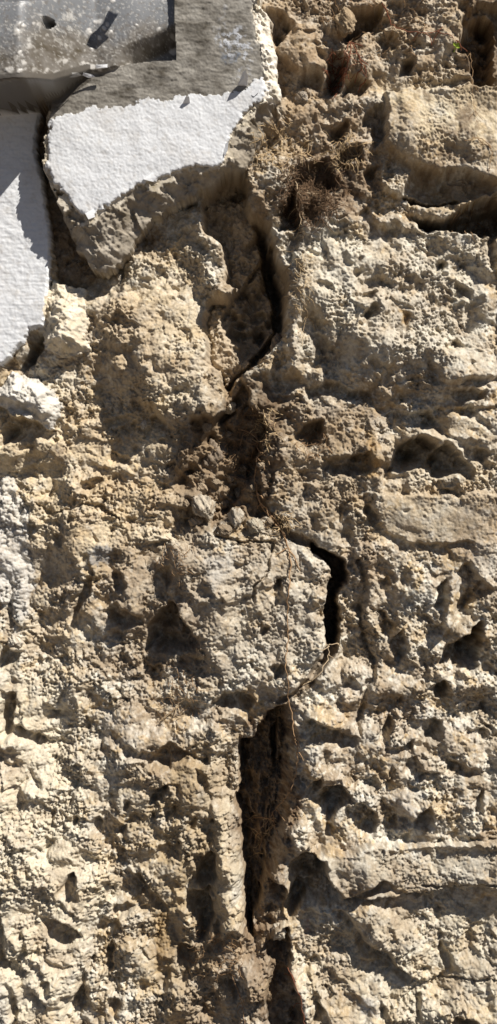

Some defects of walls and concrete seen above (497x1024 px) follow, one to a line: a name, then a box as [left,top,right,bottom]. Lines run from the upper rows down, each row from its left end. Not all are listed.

spalling [41,0,282,280]
crack [188,178,378,1024]